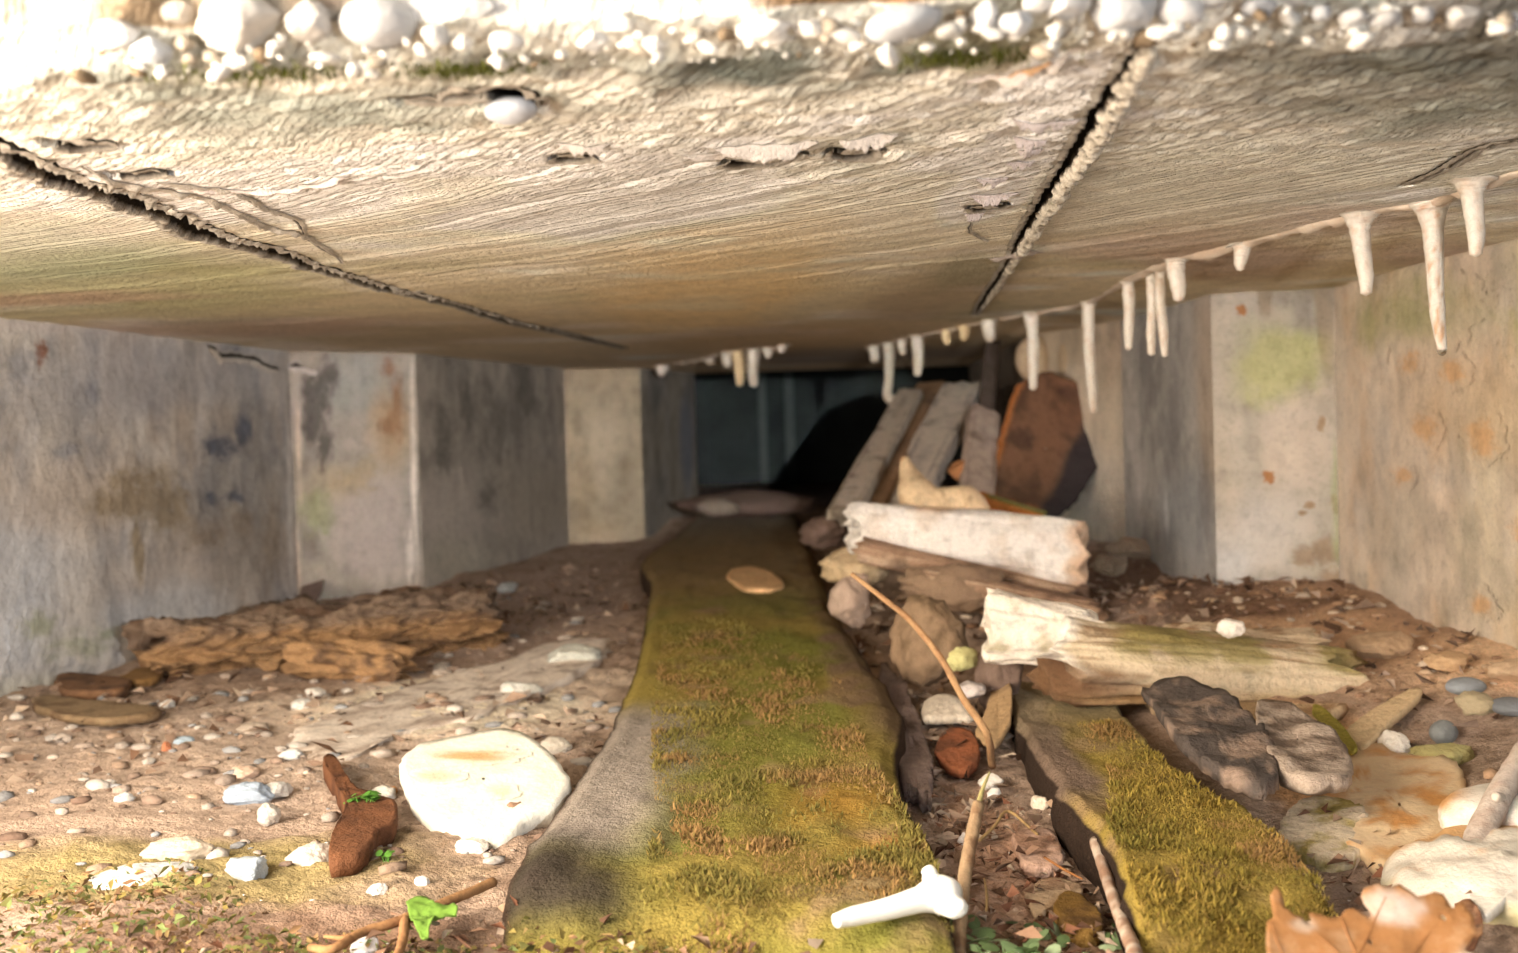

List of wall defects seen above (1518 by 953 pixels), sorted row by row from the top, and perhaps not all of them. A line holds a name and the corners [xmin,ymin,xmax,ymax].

crack [0,136,628,350]
peeling [683,133,898,170]
peeling [964,119,1082,242]
crack [971,41,1157,316]
damp [865,217,1346,350]
damp [1372,204,1413,214]
damp [1486,171,1518,190]
damp [0,333,56,452]
crack [208,344,318,376]
damp [43,352,548,603]